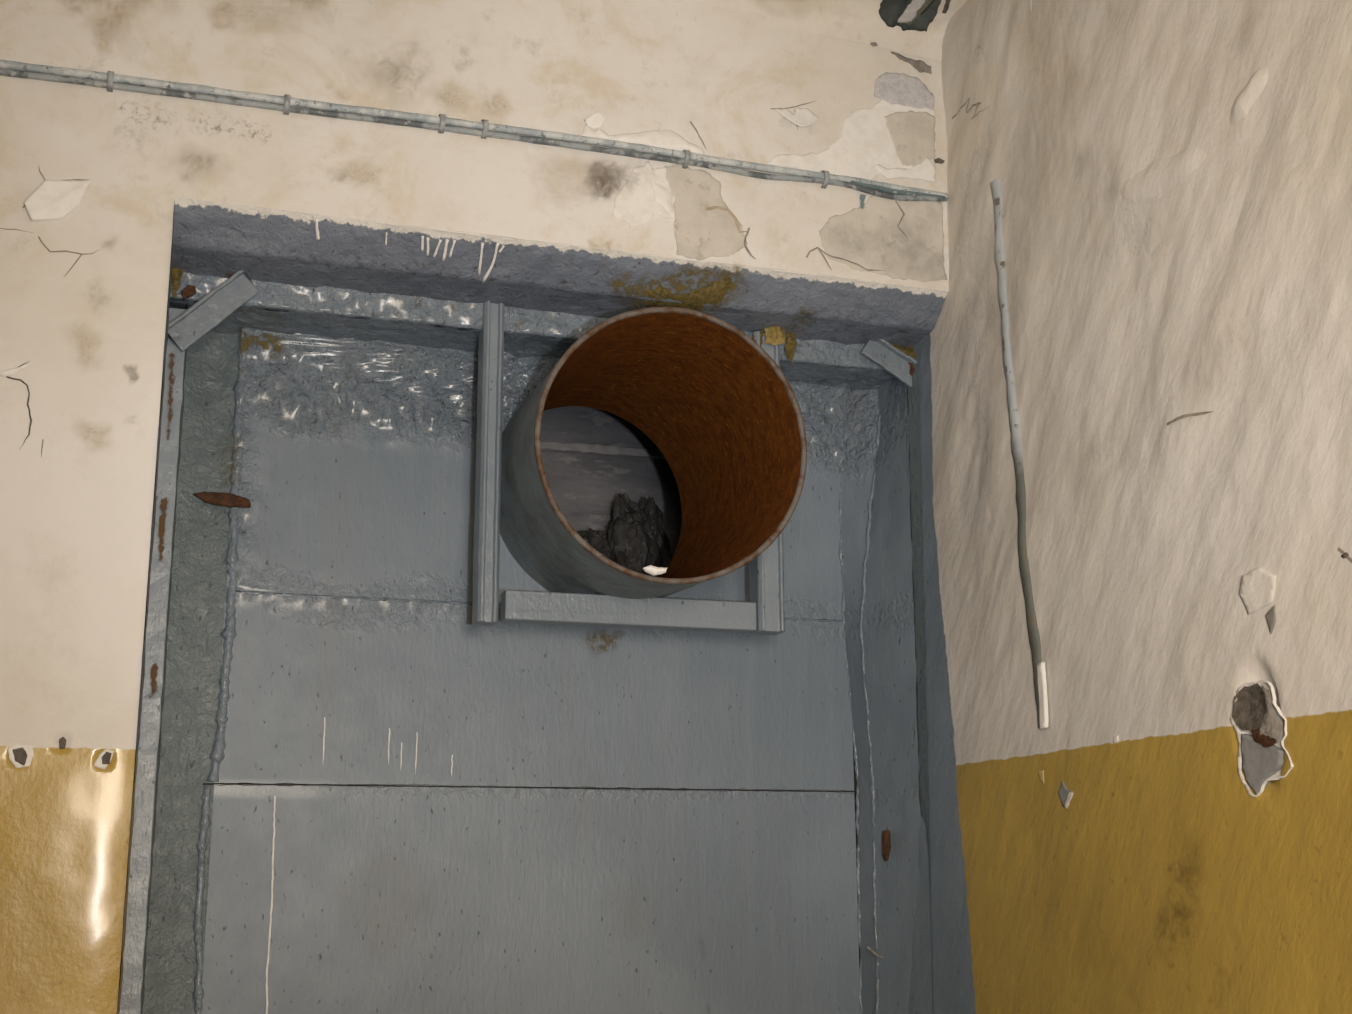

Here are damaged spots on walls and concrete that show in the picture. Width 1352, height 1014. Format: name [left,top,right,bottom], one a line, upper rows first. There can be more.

leakage [592,168,617,196]
peeling [581,112,756,261]
peeling [766,42,947,282]
crack [0,228,98,278]
rust [172,268,184,298]
crack [0,361,44,458]
rust [158,498,167,560]
spalling [1230,680,1294,797]